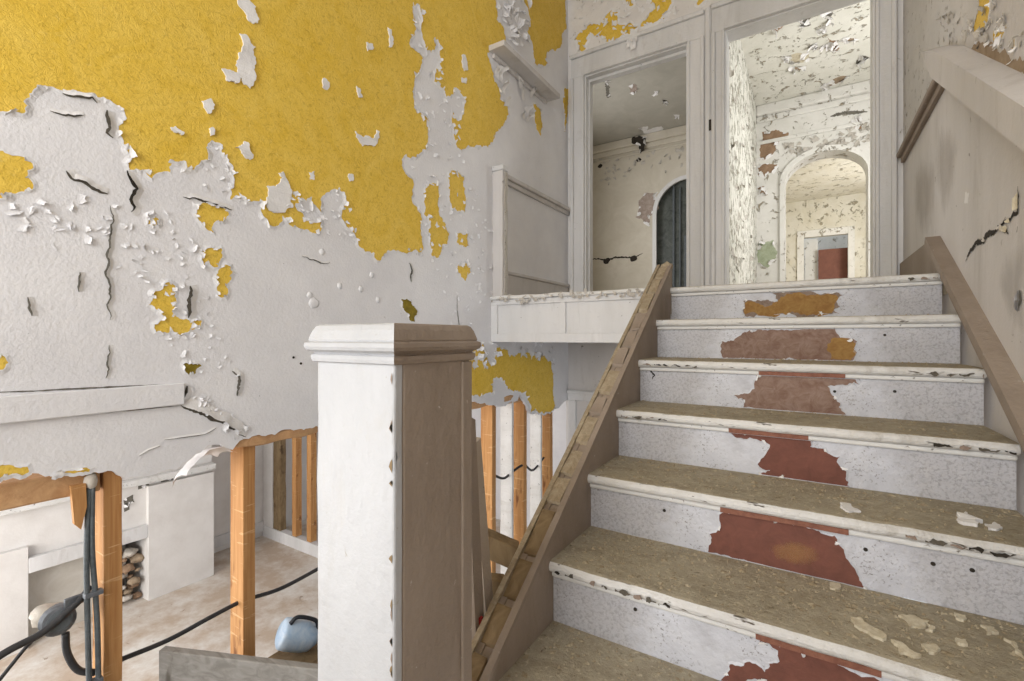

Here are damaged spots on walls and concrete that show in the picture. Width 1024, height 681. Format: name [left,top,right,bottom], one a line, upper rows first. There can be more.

peeling [781,11,869,88]
crack [0,169,193,413]
crack [183,192,232,210]
peeling [0,0,685,440]
crack [594,254,641,264]
crack [966,186,1019,260]
peeling [719,290,861,416]
peeling [389,421,399,489]
peeling [729,428,851,487]
peeling [840,502,861,513]
peeling [703,507,877,592]
peeling [719,634,883,681]